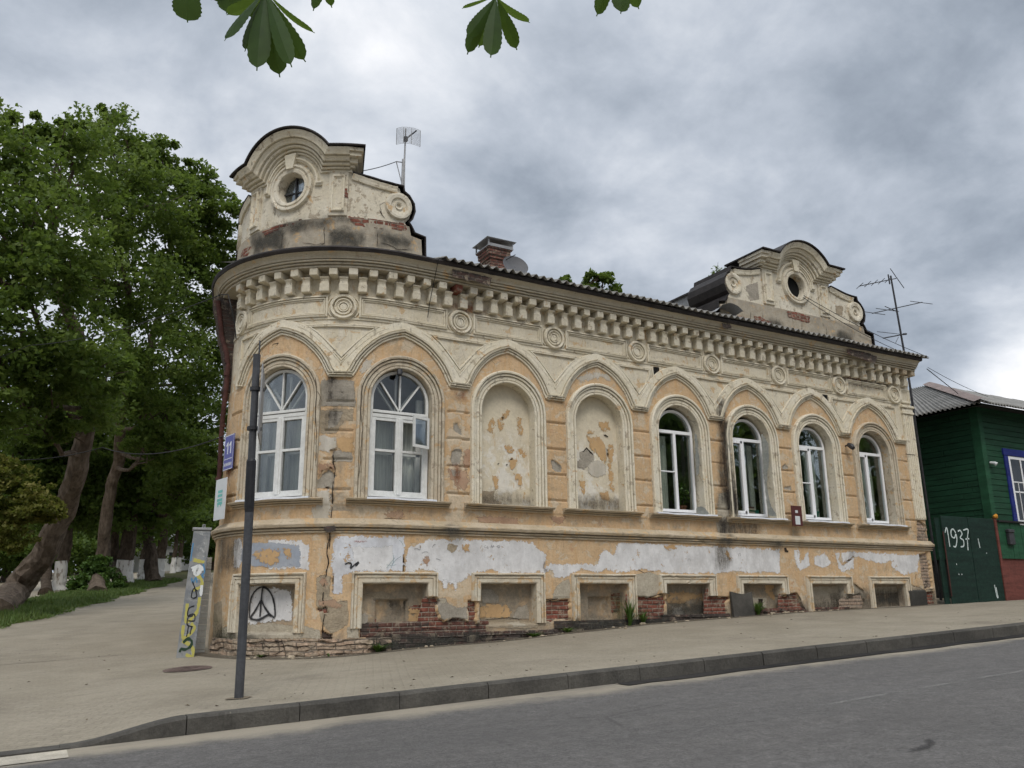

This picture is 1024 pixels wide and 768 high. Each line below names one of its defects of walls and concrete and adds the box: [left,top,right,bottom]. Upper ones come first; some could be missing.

flaking render [263,219,302,236]
flaking render [348,216,407,231]
peeling [487,409,523,436]
peeling [577,422,615,501]
flaking render [477,445,527,524]
crack [248,379,363,656]
flaking render [447,543,470,553]
flaking render [213,575,571,639]
flaking render [703,588,728,614]
flaking render [753,584,802,608]